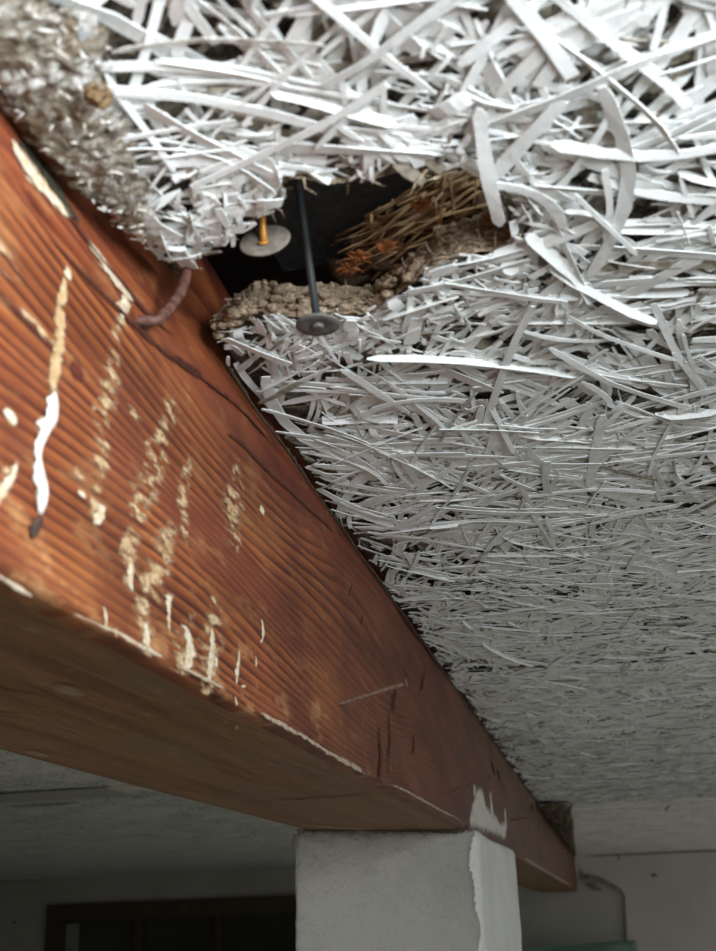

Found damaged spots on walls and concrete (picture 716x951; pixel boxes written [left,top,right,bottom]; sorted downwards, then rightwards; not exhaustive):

spalling [330,166,398,183]
spalling [412,165,468,177]
spalling [246,174,318,222]
spalling [220,192,518,320]
peeling [75,613,162,657]